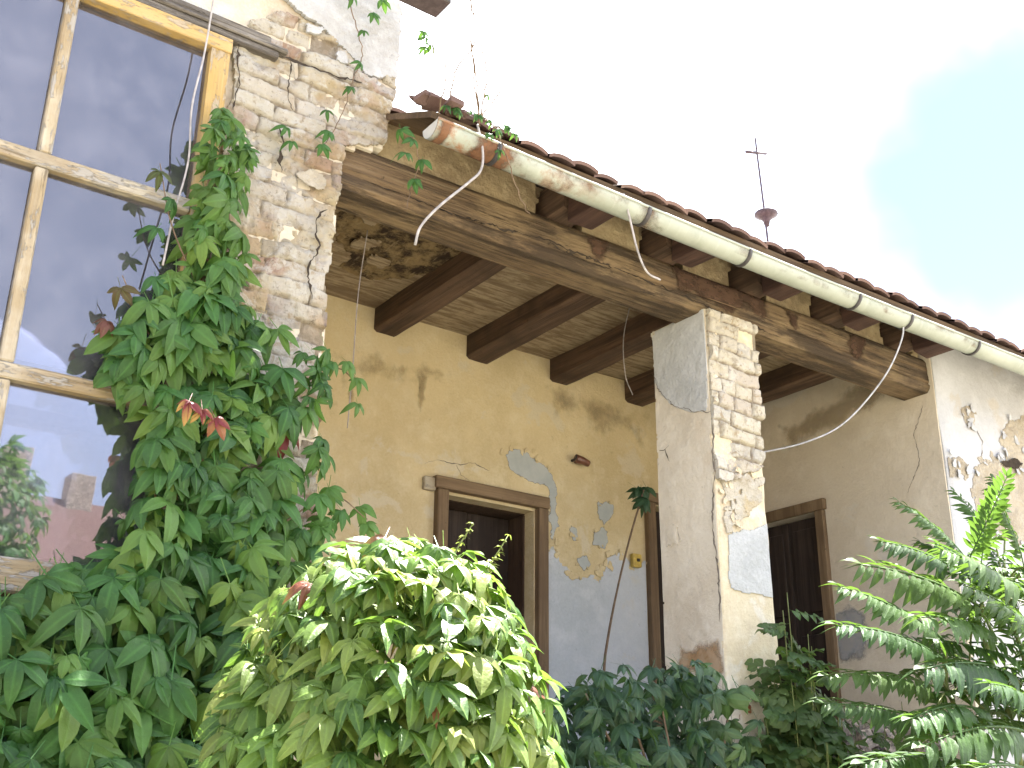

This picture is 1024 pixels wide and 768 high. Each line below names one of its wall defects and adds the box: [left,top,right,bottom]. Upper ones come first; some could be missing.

flaking render [210,11,397,407]
crack [307,210,326,298]
crack [277,56,362,170]
corrosion [431,121,451,145]
corrosion [465,137,514,170]
flaking render [240,412,323,530]
flaking render [705,308,766,533]
flaking render [961,404,977,432]
flaking render [947,414,1024,546]
peeling [500,445,649,743]